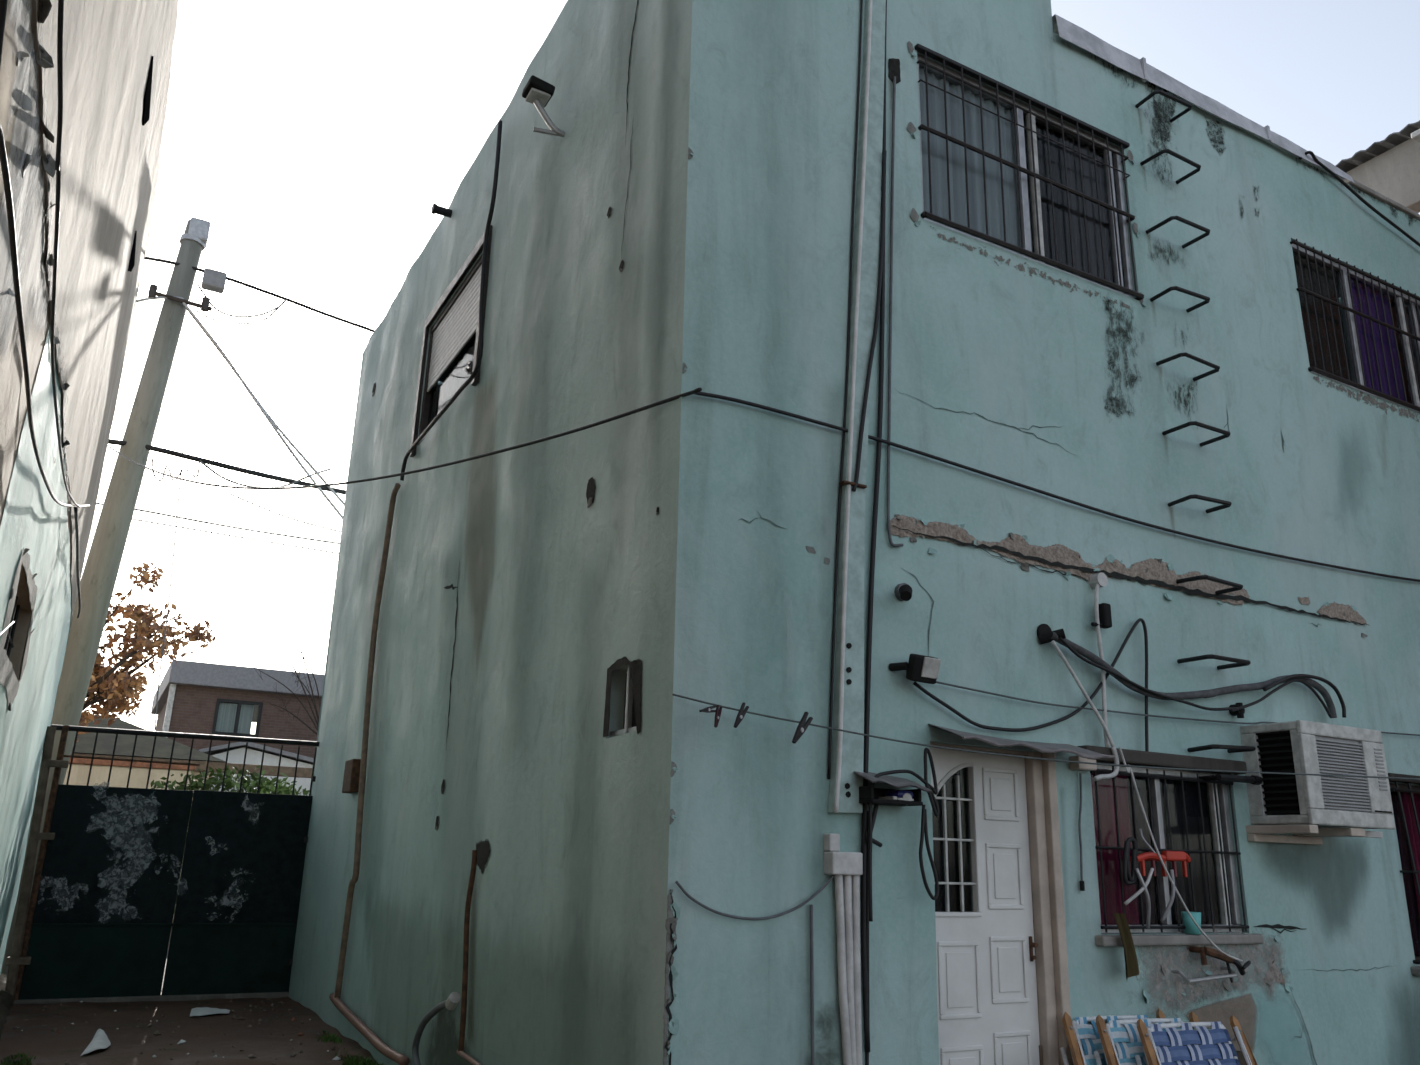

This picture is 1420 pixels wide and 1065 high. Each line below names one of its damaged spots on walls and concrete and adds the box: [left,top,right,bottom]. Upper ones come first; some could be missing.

peeling [0,0,49,356]
damp [1090,53,1176,183]
crack [897,390,1075,455]
damp [1105,300,1137,417]
damp [1175,383,1195,414]
flaking render [890,514,1368,637]
spalling [663,889,680,1065]